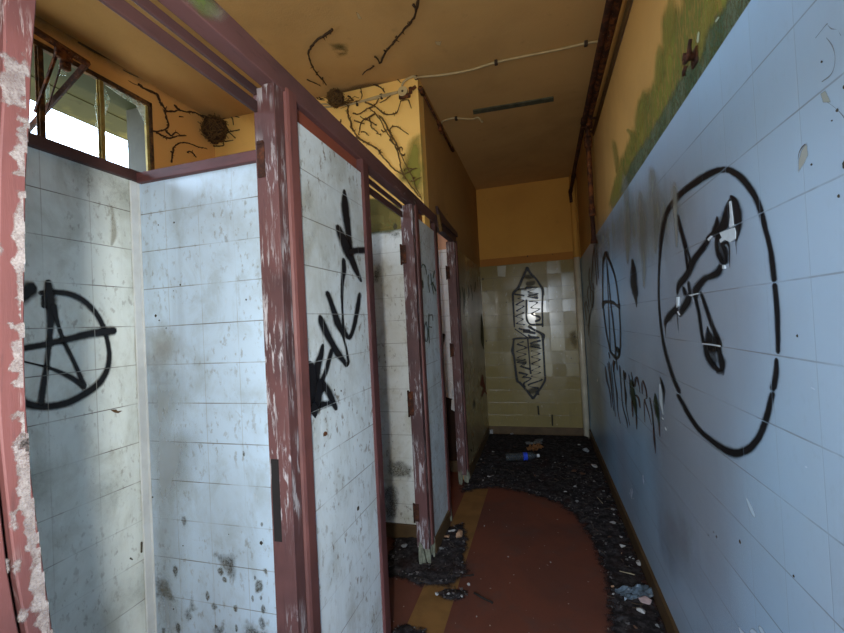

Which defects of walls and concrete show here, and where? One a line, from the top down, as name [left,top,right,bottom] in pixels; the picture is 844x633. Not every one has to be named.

peeling [0,53,30,177]
peeling [7,191,26,388]
peeling [9,411,53,633]
water stain [218,557,234,582]
water stain [236,577,265,633]